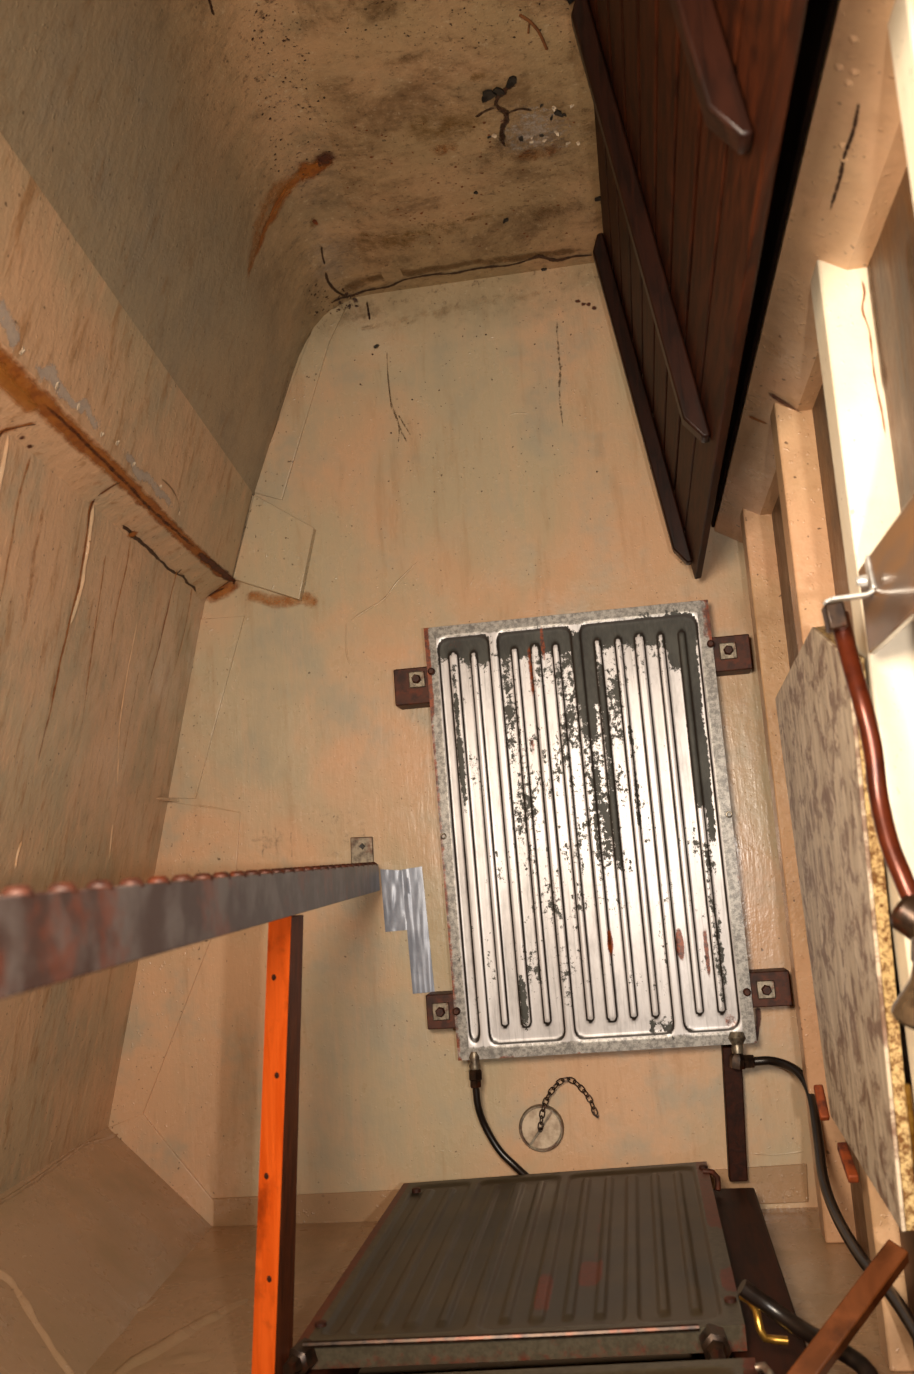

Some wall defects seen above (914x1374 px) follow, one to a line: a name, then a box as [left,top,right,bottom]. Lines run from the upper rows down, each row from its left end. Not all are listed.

leakage [246,3,567,238]
crack [476,75,532,146]
crack [830,104,860,209]
corrosion [248,152,335,270]
crack [321,247,591,320]
corrosion [0,349,238,755]
crack [123,525,196,591]